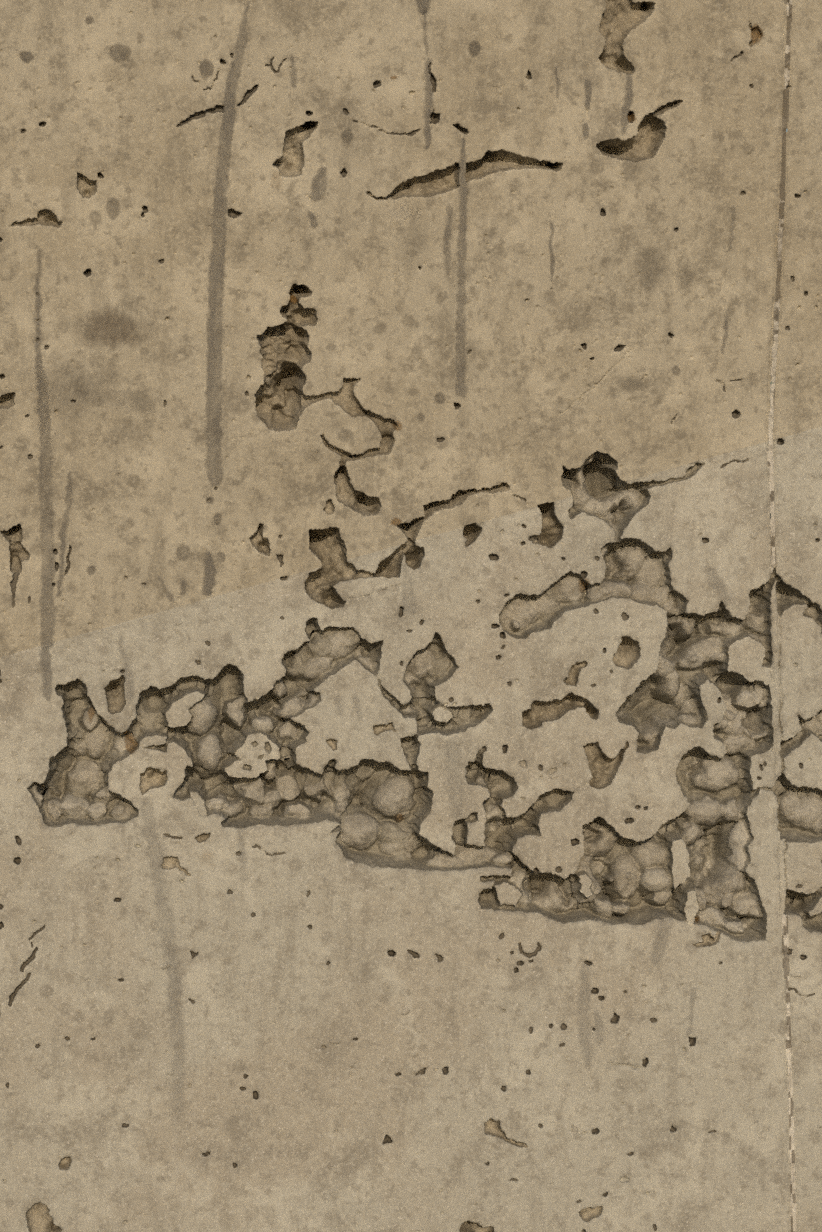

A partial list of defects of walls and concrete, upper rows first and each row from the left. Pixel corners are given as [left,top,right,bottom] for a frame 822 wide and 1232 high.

damp [417,0,429,13]
hole [598,0,655,75]
spalling [273,121,318,178]
spalling [366,149,563,200]
hole [596,100,683,163]
damp [206,177,226,395]
hole [255,284,318,432]
spalling [304,465,510,609]
hole [532,502,564,548]
damp [204,553,216,595]
hole [522,661,599,730]
hole [583,741,629,789]